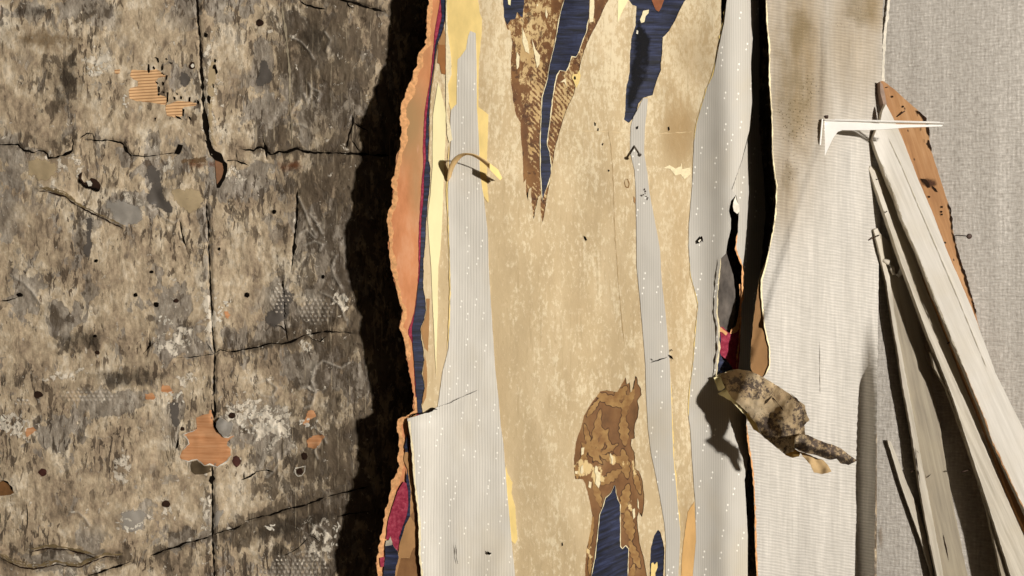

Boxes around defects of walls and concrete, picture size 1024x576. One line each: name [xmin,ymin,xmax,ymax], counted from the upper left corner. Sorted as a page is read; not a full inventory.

crack [0,133,172,159]
spalling [86,57,217,185]
crack [196,0,389,165]
peeling [447,153,502,181]
peeling [516,28,540,69]
crack [180,190,351,419]
spalling [881,163,962,364]
spalling [145,385,279,475]
peeling [575,447,600,488]
peeling [714,369,857,474]
crack [88,467,366,576]